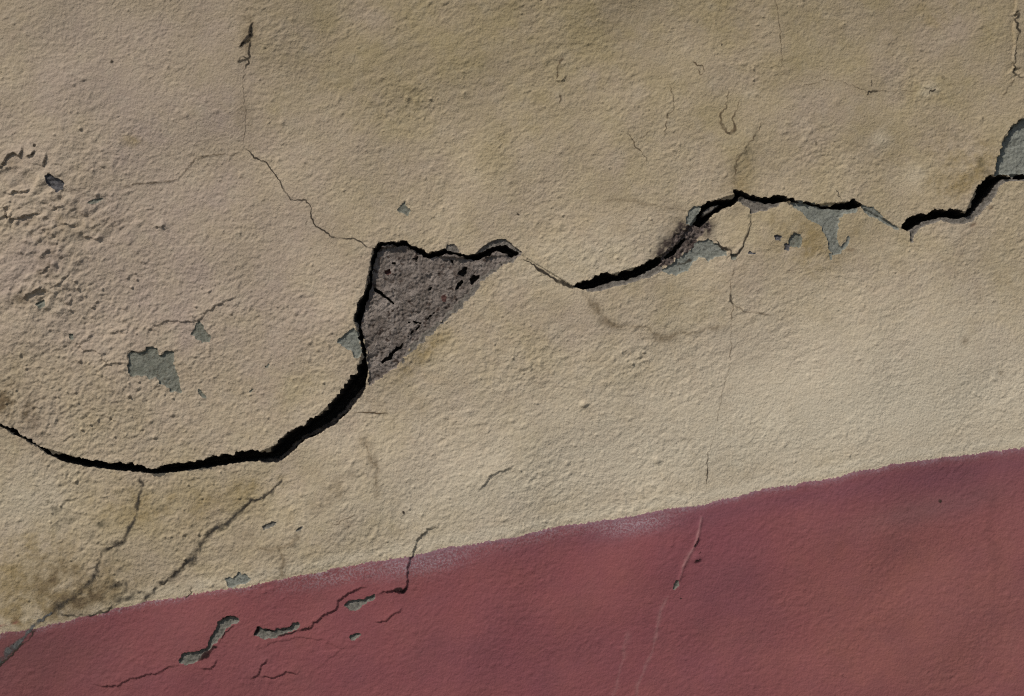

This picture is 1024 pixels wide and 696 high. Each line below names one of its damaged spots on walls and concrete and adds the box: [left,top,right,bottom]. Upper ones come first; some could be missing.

spalling [44,173,64,193]
spalling [737,118,1024,260]
crack [901,174,1024,231]
spalling [337,239,522,386]
crack [0,22,862,666]
peeling [127,346,182,393]
peeling [344,594,375,611]
peeling [178,615,240,665]
peeling [253,622,309,640]